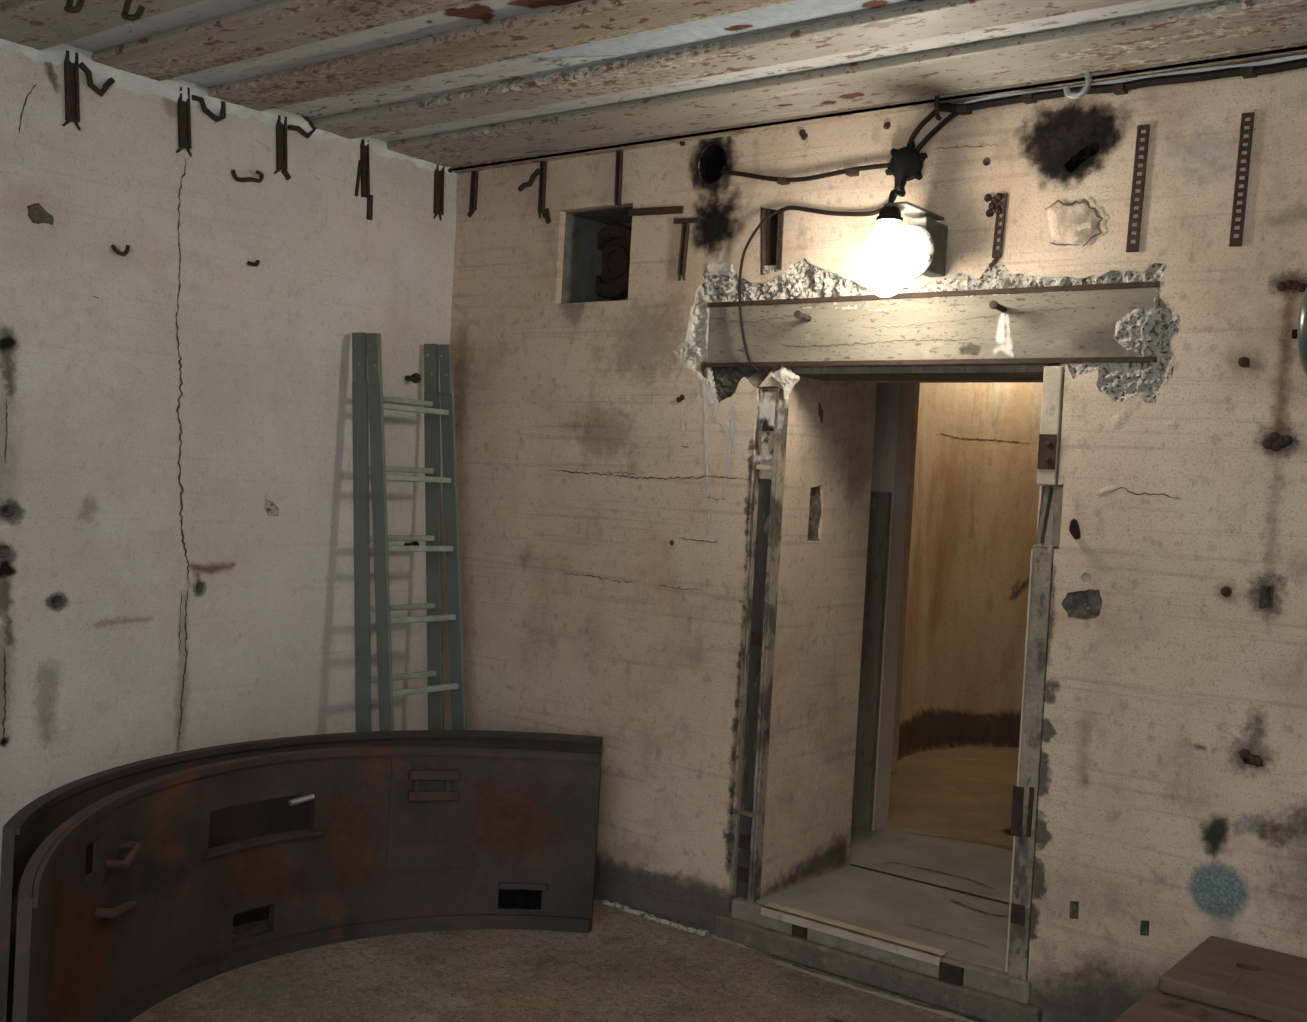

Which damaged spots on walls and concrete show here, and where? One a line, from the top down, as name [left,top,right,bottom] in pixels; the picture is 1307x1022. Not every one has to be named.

rust [445,4,494,23]
rust [508,0,583,8]
flaking render [27,203,53,225]
spalling [673,259,887,405]
spalling [897,263,1181,403]
crack [176,156,190,741]
efflorescence [700,379,735,533]
crack [1097,487,1180,499]
flaking render [1046,568,1102,660]
leakage [0,648,8,746]
spalling [1037,719,1056,795]
spalling [1028,811,1051,939]